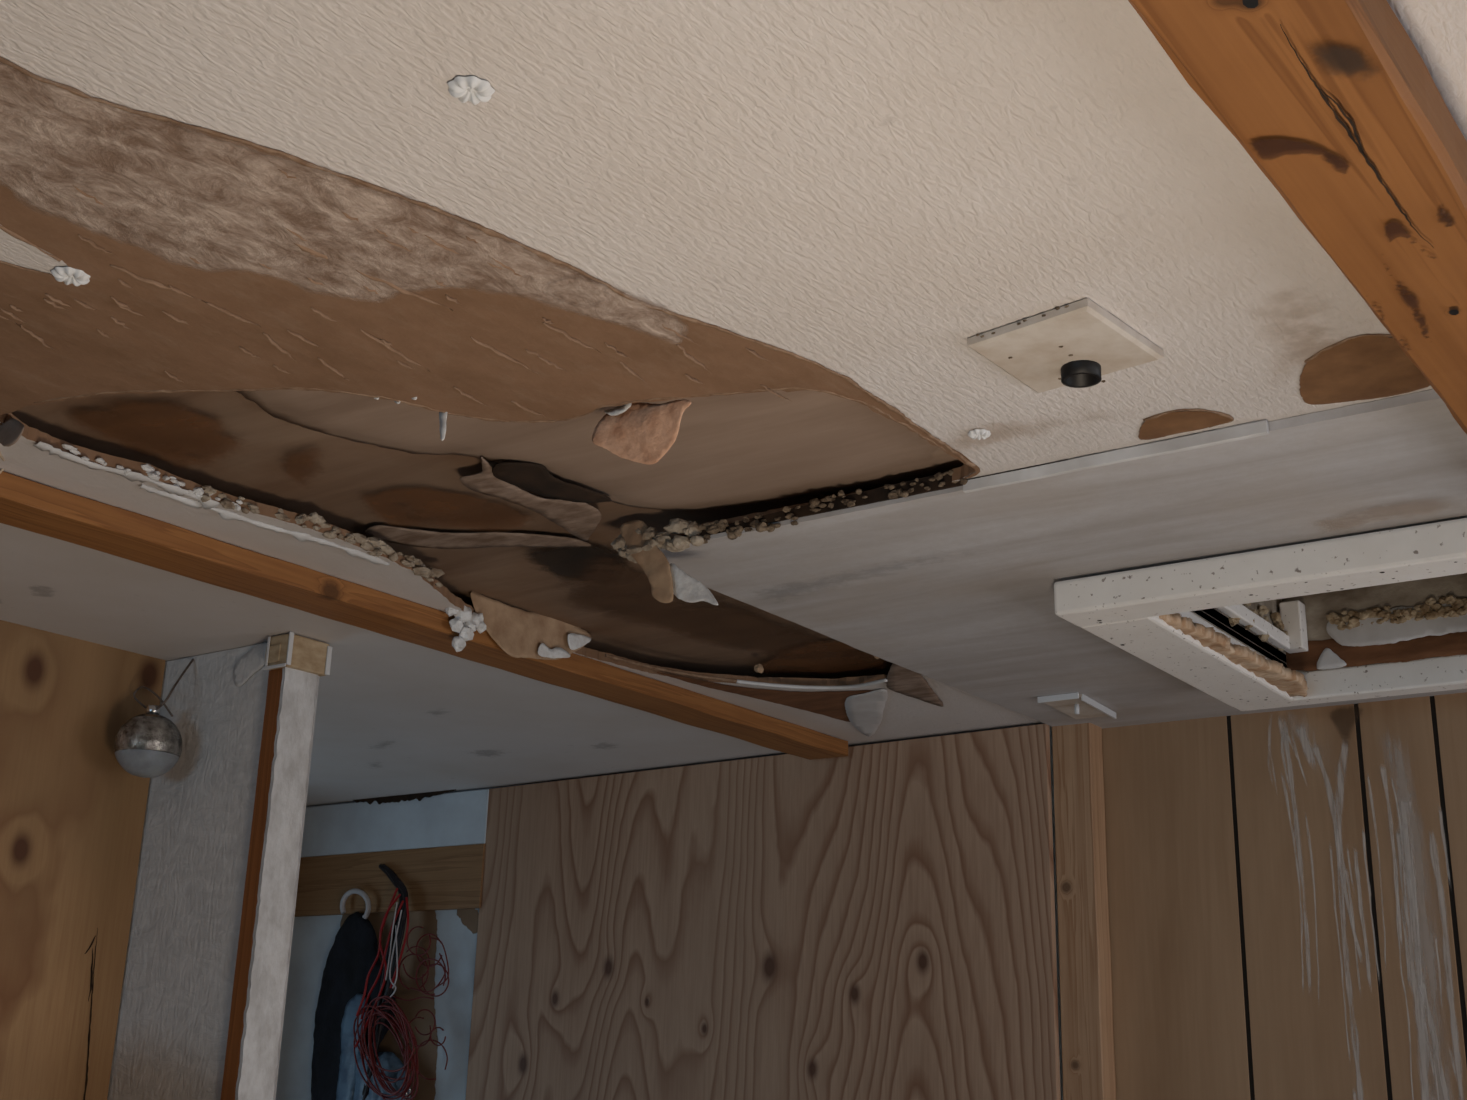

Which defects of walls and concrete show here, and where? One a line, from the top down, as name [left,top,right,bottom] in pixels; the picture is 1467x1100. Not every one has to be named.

crack [1280,24,1434,248]
peeling [0,56,980,503]
peeling [1138,409,1234,440]
peeling [1299,334,1430,405]
spalling [62,444,445,588]
spalling [611,489,868,563]
water stain [1268,722,1462,1100]